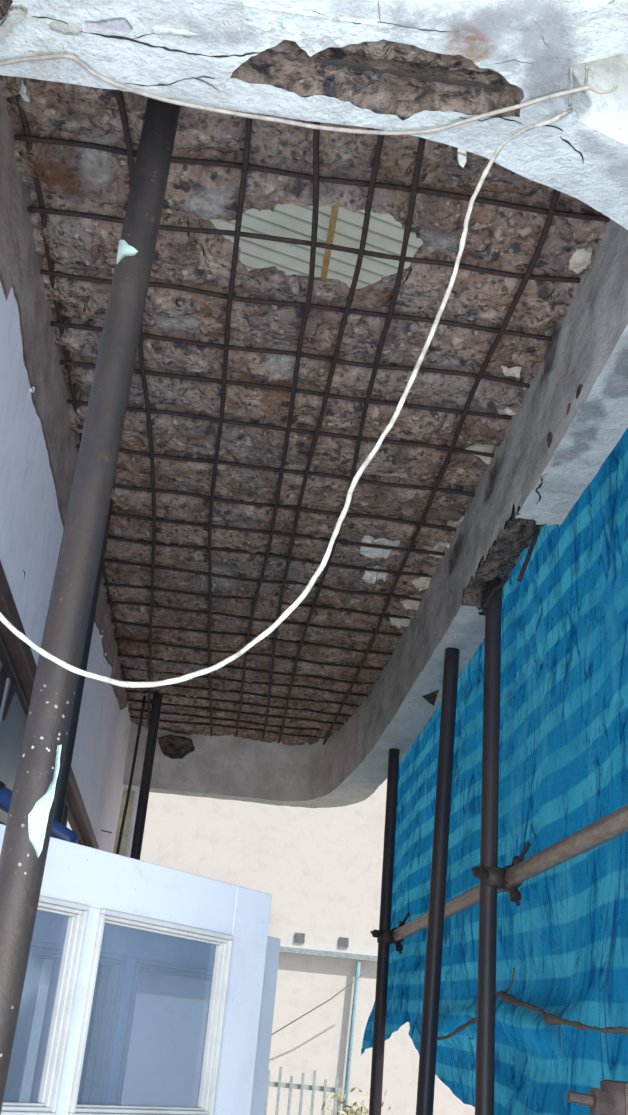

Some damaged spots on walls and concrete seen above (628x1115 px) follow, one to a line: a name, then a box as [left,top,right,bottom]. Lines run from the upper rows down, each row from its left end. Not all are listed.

flaking render [0,0,28,43]
peeling [85,17,133,34]
crack [33,16,270,90]
spalling [230,39,524,121]
crack [461,116,584,164]
peeling [0,82,137,529]
spalling [94,113,610,759]